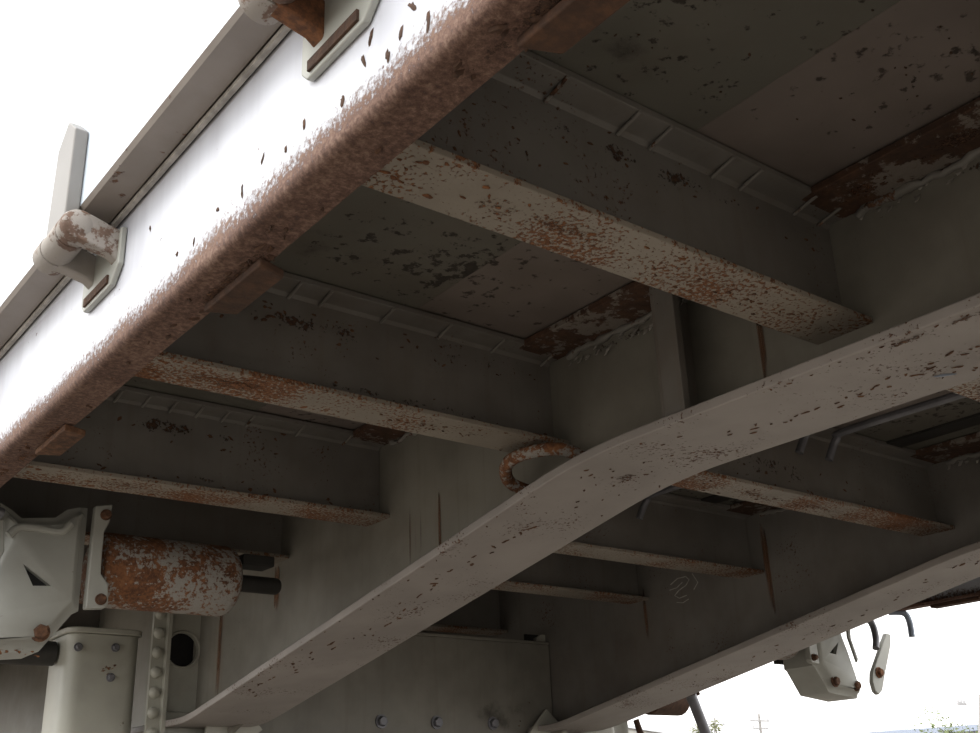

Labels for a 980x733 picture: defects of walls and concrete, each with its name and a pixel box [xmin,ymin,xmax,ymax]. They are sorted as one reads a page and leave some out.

corrosion [460,186,600,250]